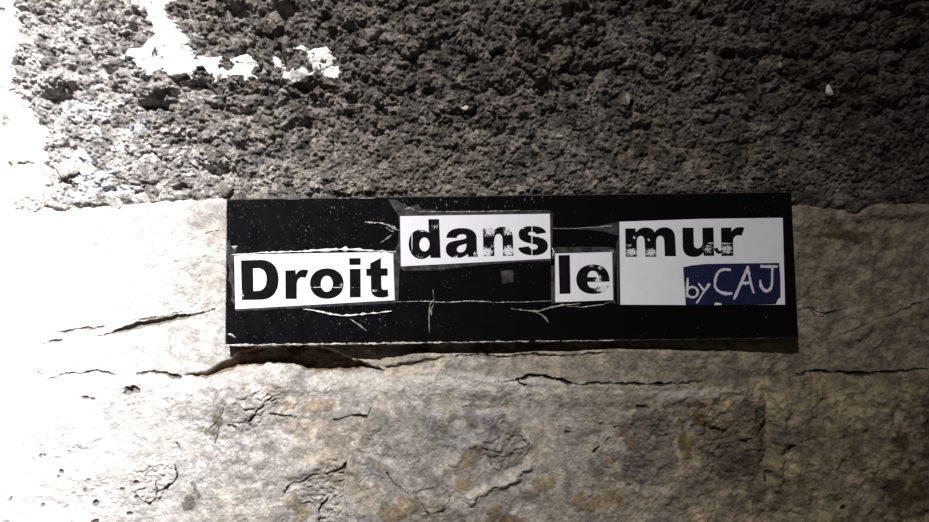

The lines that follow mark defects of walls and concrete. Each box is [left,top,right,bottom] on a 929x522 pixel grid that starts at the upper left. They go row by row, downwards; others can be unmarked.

peeling [120,0,261,85]
peeling [272,45,342,83]
peeling [0,0,79,216]
spalling [219,181,234,198]
crack [40,308,216,344]
crack [37,369,182,380]
crack [455,351,702,386]
crack [789,367,928,378]
crack [209,392,293,443]
crack [333,409,370,420]
crack [386,472,450,516]